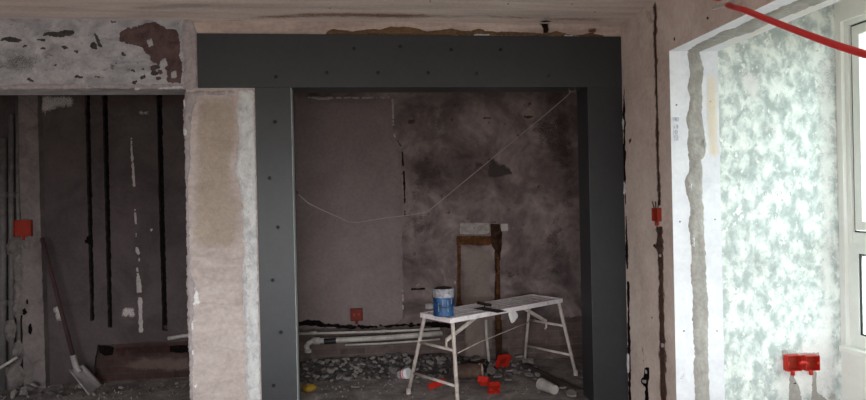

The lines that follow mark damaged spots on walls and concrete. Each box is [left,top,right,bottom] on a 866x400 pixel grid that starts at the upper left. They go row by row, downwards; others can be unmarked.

peeling [37,30,78,53]
flaking render [111,21,183,90]
crack [653,3,661,206]